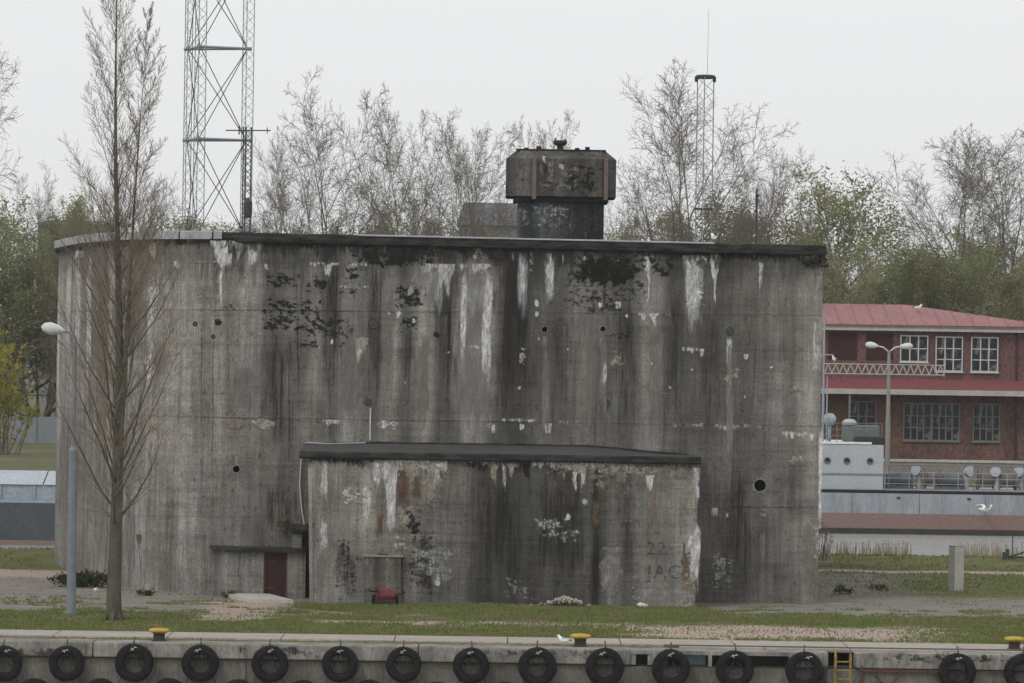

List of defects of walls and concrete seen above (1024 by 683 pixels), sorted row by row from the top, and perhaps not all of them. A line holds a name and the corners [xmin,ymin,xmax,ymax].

damp [210,241,262,301]
damp [310,262,367,353]
damp [675,254,719,330]
damp [421,251,564,433]
spalling [251,418,275,430]
damp [363,460,455,586]
rust [397,468,422,505]
damp [533,462,699,523]
damp [317,523,358,591]
rust [681,552,691,581]
damp [687,526,700,584]